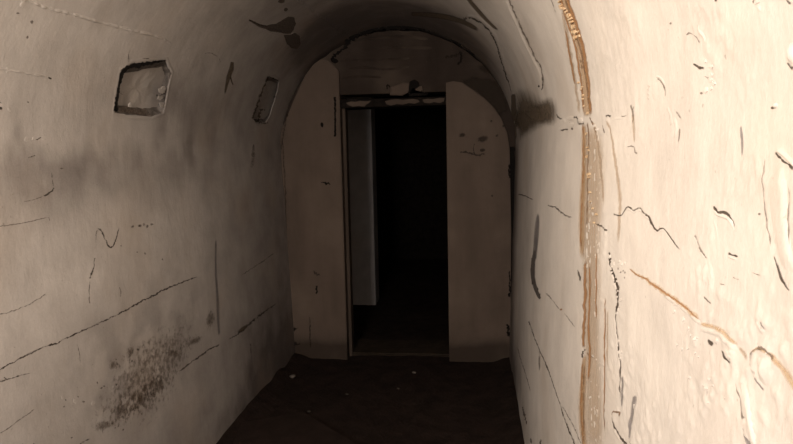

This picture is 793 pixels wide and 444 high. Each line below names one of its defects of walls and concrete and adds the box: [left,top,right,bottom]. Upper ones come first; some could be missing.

crack [463,14,514,92]
damp [511,94,554,139]
crack [1,277,196,382]
crack [89,229,119,303]
crack [180,243,275,371]
damp [530,215,541,299]
crack [519,194,571,219]
rust [558,0,606,444]
crack [606,253,627,444]
crack [597,206,737,303]
rust [630,269,745,355]
crack [722,349,731,363]